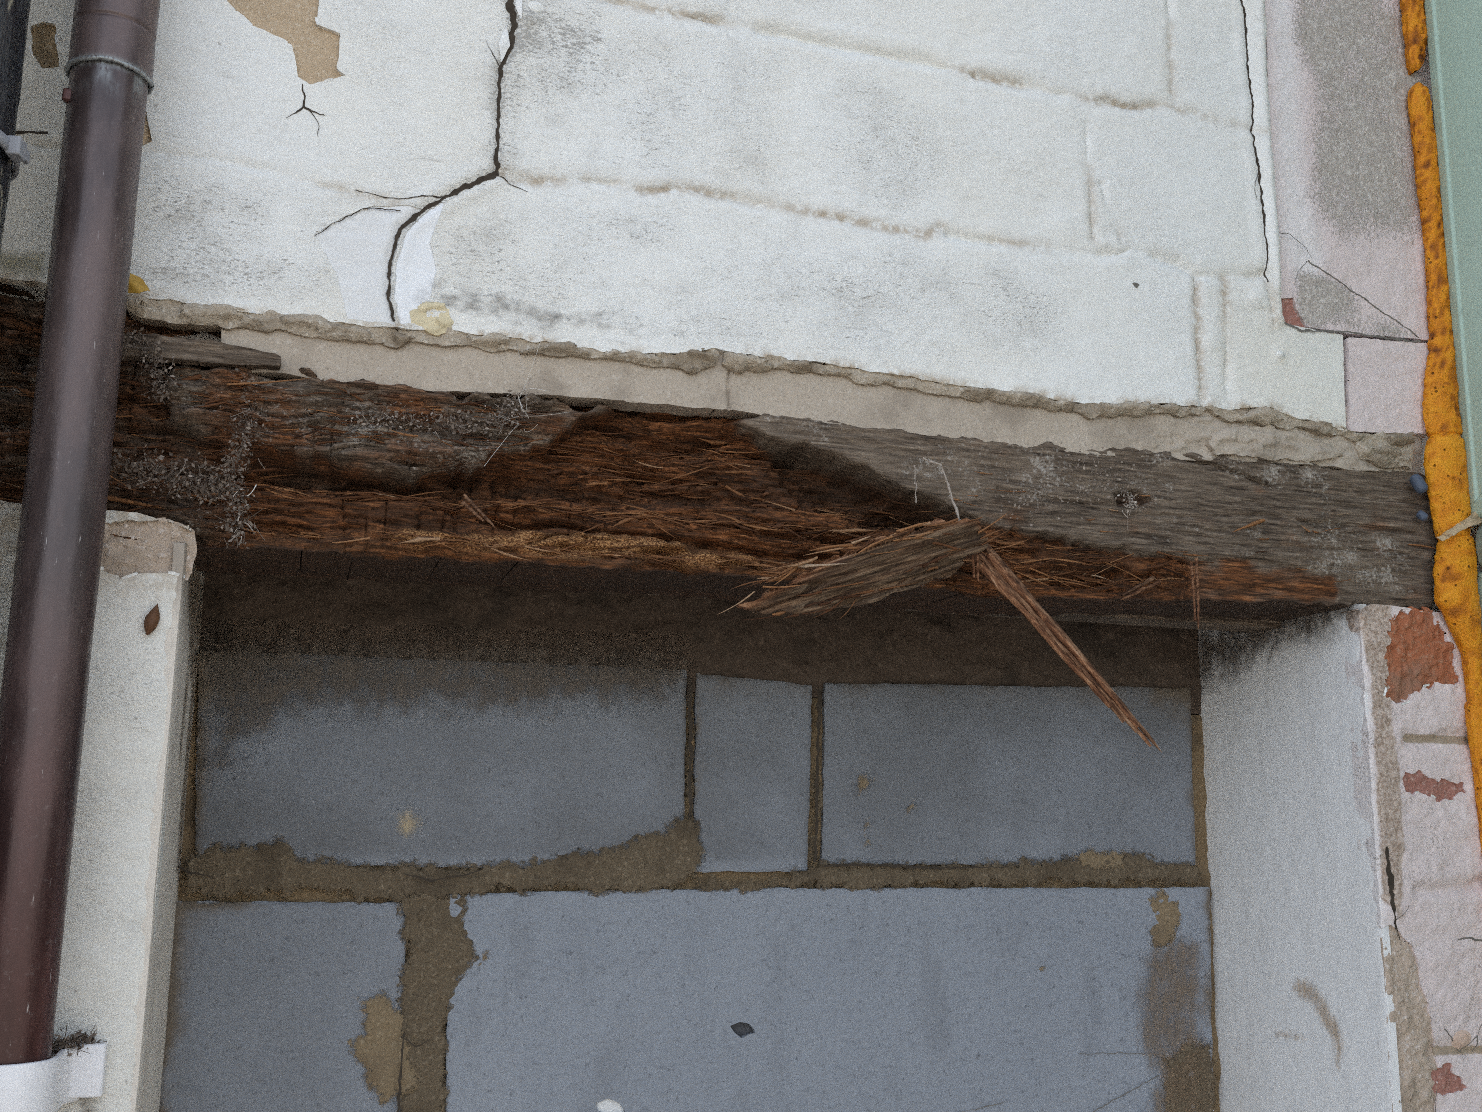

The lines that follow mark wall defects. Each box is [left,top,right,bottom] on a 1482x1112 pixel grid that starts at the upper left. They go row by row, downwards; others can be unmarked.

peeling [227,0,342,84]
crack [314,0,528,322]
crack [1240,0,1421,342]
spalling [1383,606,1458,705]
spalling [1403,770,1465,802]
crack [1385,847,1409,940]
water stain [1145,942,1201,1112]
peeling [1380,925,1466,1112]